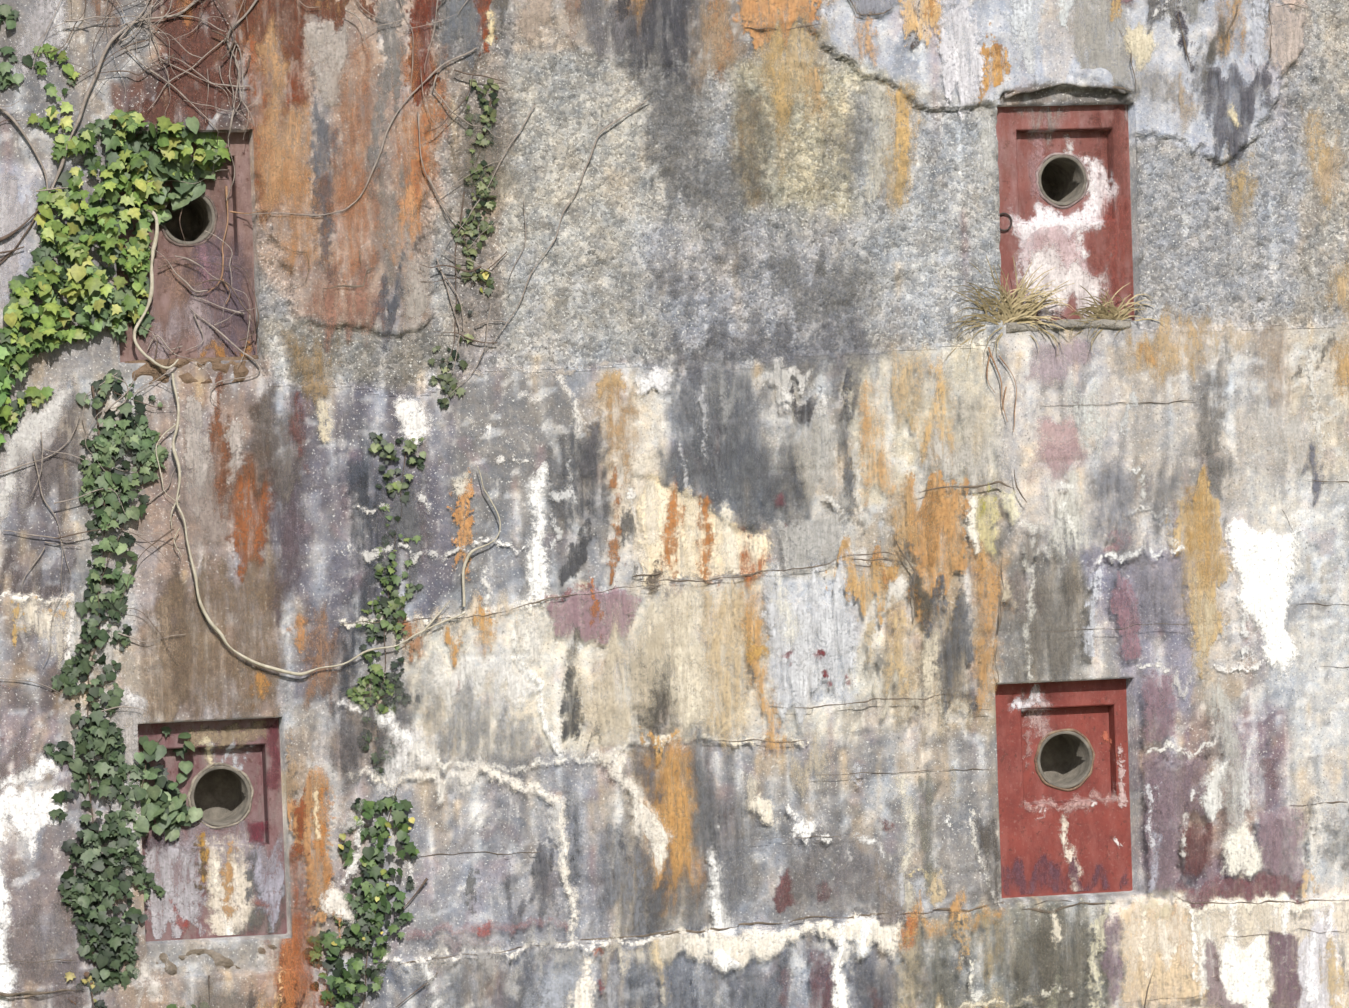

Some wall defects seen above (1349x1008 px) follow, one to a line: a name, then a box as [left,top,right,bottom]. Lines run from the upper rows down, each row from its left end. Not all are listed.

corrosion [127,0,378,265]
corrosion [398,0,446,258]
spalling [135,0,1349,401]
crack [1094,27,1136,93]
corrosion [142,234,337,768]
peeling [1040,419,1082,477]
leakage [0,749,66,858]
leakage [0,869,82,1008]
corrosion [190,729,342,1008]
leakage [320,813,365,924]
leakage [330,357,1128,1008]
leakage [1124,518,1349,1008]